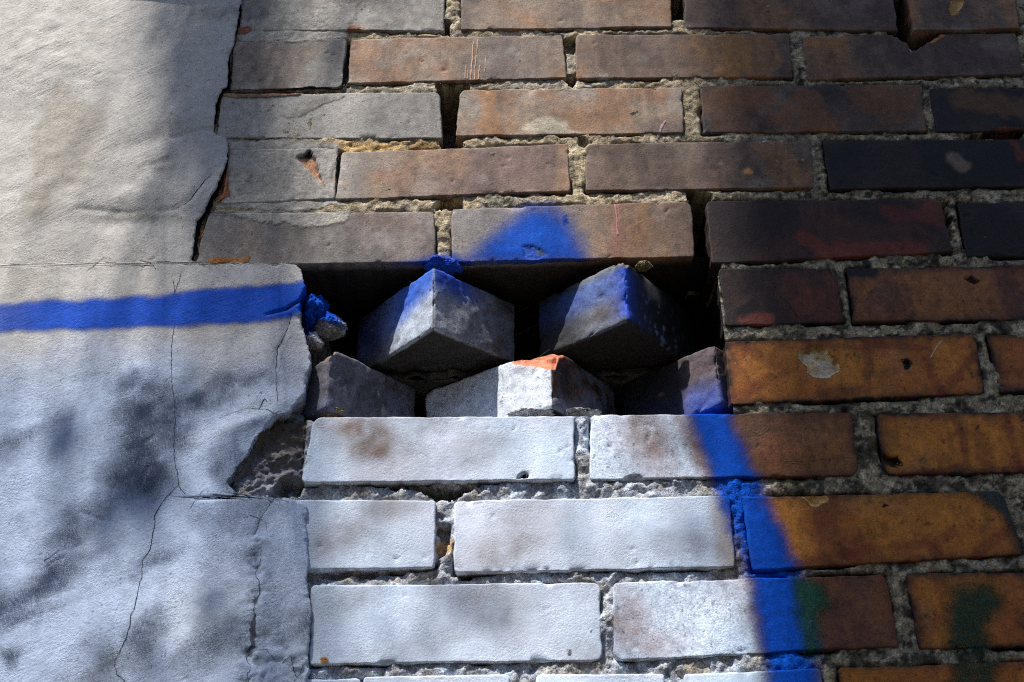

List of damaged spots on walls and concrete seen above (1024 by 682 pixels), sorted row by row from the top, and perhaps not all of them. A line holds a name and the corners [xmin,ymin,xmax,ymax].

crack [114,0,350,682]
spalling [798,346,840,378]
spalling [229,411,307,498]